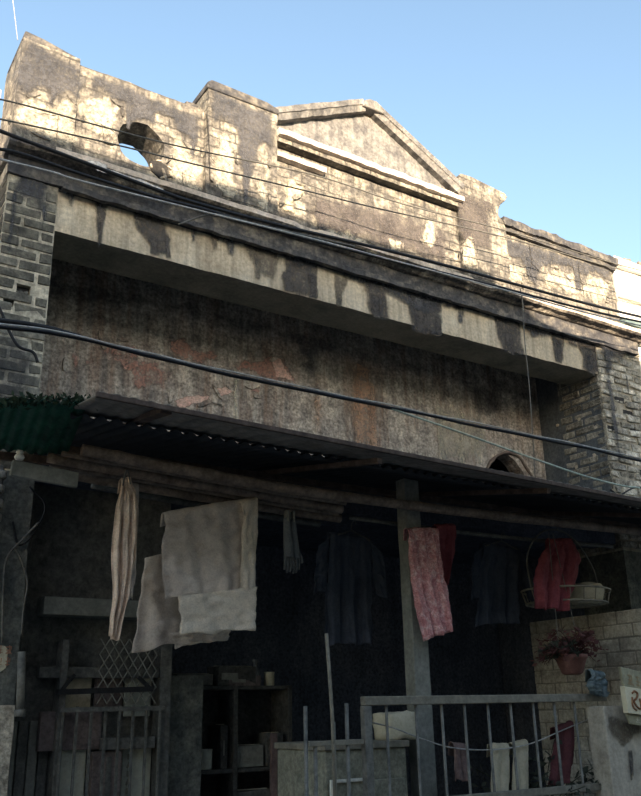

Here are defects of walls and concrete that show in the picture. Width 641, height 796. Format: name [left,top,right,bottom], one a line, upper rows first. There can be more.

leakage [15,42,198,166]
leakage [212,91,271,206]
leakage [90,199,108,243]
leakage [134,212,171,258]
leakage [211,233,463,336]
leakage [309,199,446,261]
spalling [419,221,439,247]
spalling [461,237,476,269]
leakage [507,240,609,292]
spalling [545,266,611,304]